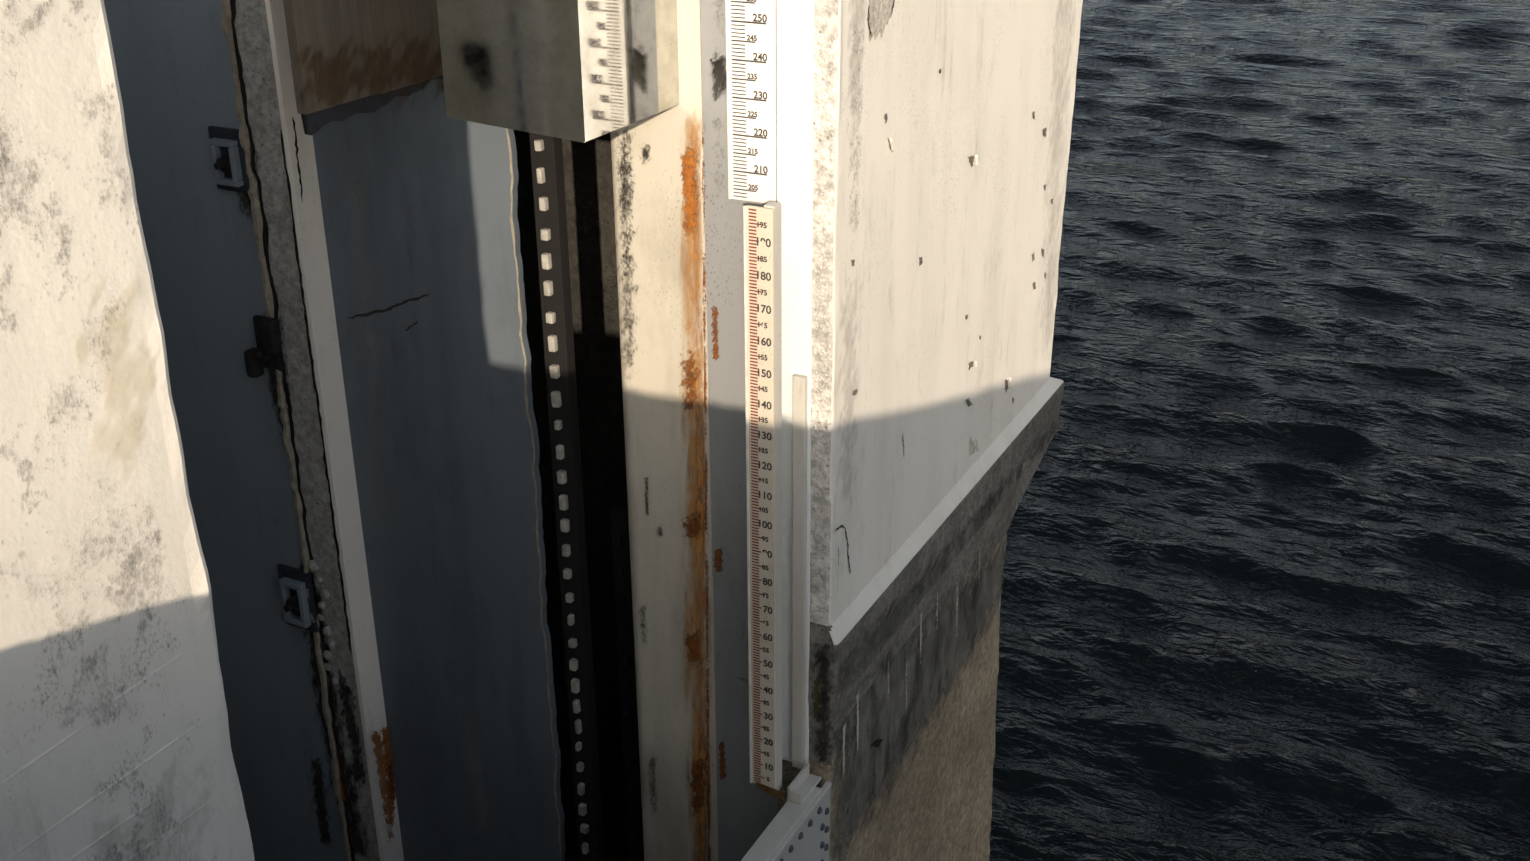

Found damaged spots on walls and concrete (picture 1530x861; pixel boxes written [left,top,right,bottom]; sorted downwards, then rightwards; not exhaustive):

peeling [867,0,895,43]
corrosion [371,726,396,839]
corrosion [681,124,726,861]
leakage [813,425,1062,861]